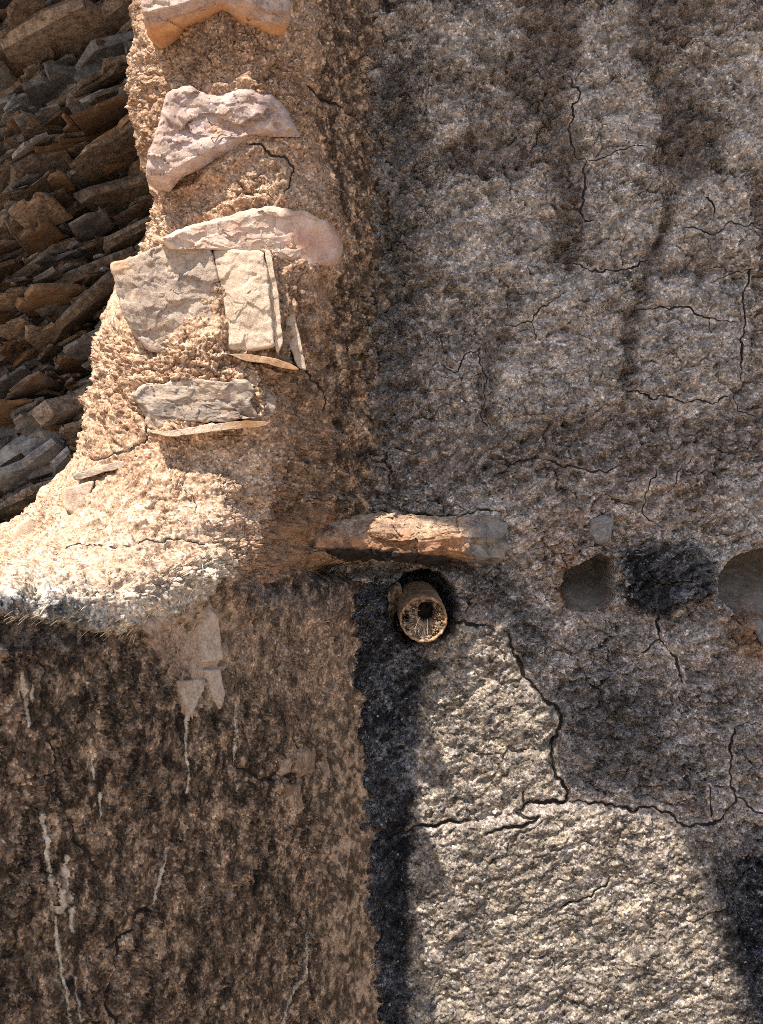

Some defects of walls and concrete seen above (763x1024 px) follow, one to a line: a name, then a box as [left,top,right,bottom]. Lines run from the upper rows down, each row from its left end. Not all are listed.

crack [249,143,295,193]
crack [567,75,652,222]
crack [685,197,763,235]
crack [565,260,648,273]
crack [625,269,758,417]
crack [403,508,501,517]
crack [642,597,682,682]
efflorescence [20,675,34,727]
crack [389,620,763,837]
efflorescence [39,813,83,1024]
efflorescence [149,847,169,909]
damp [283,932,309,1024]